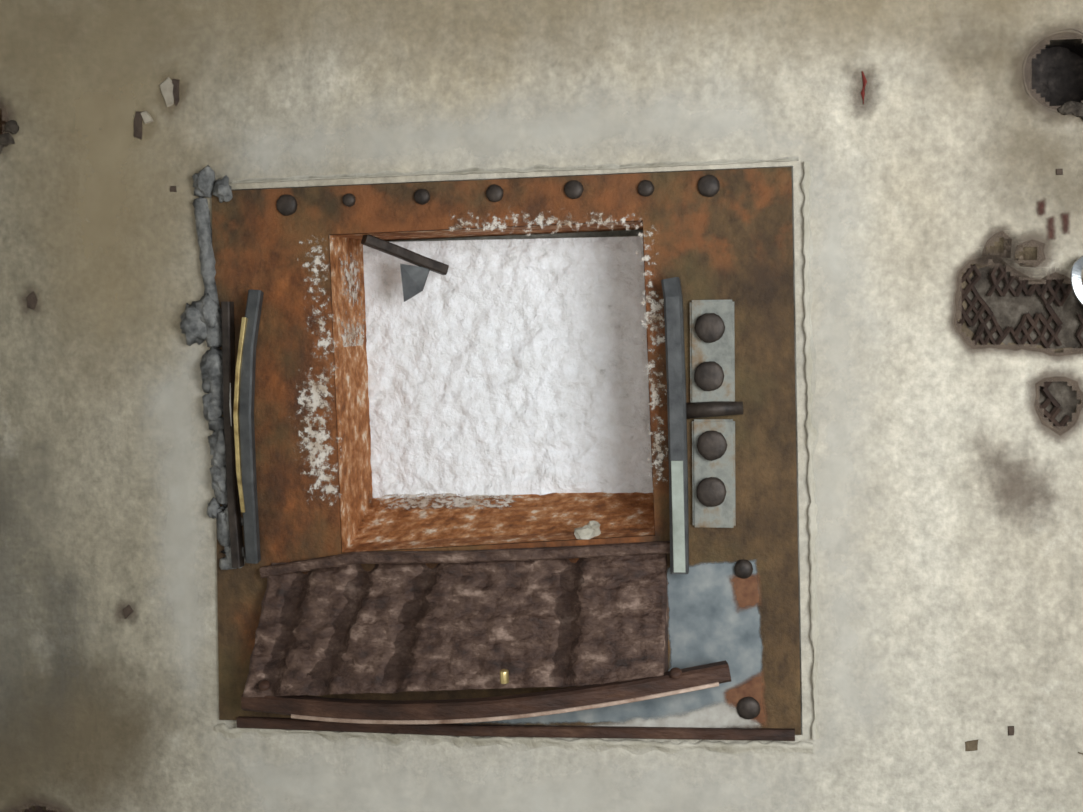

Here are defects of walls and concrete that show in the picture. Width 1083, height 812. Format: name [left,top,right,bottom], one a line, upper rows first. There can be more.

flaking render [950,227,1083,360]
flaking render [1031,372,1083,439]
corrosion [730,575,760,609]
corrosion [725,673,767,725]
flaking render [3,797,71,812]